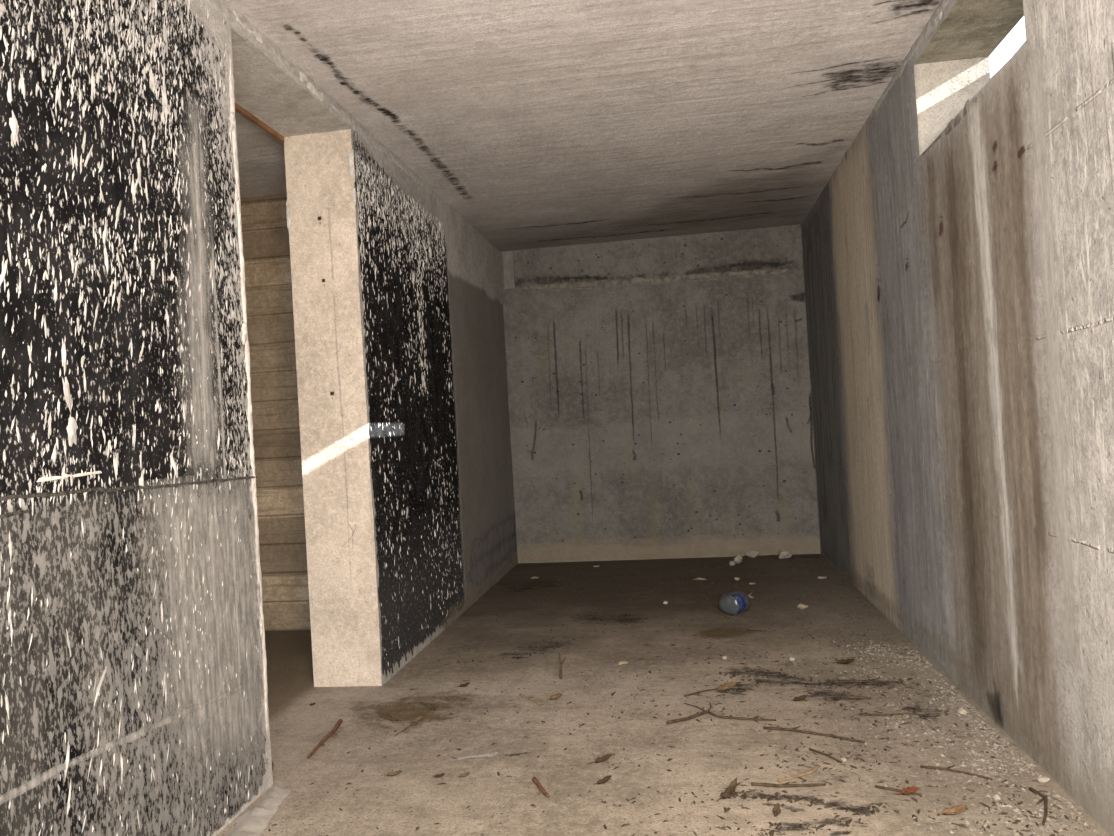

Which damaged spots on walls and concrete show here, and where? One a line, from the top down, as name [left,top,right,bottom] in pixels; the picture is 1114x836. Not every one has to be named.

damp [792,0,1082,770]